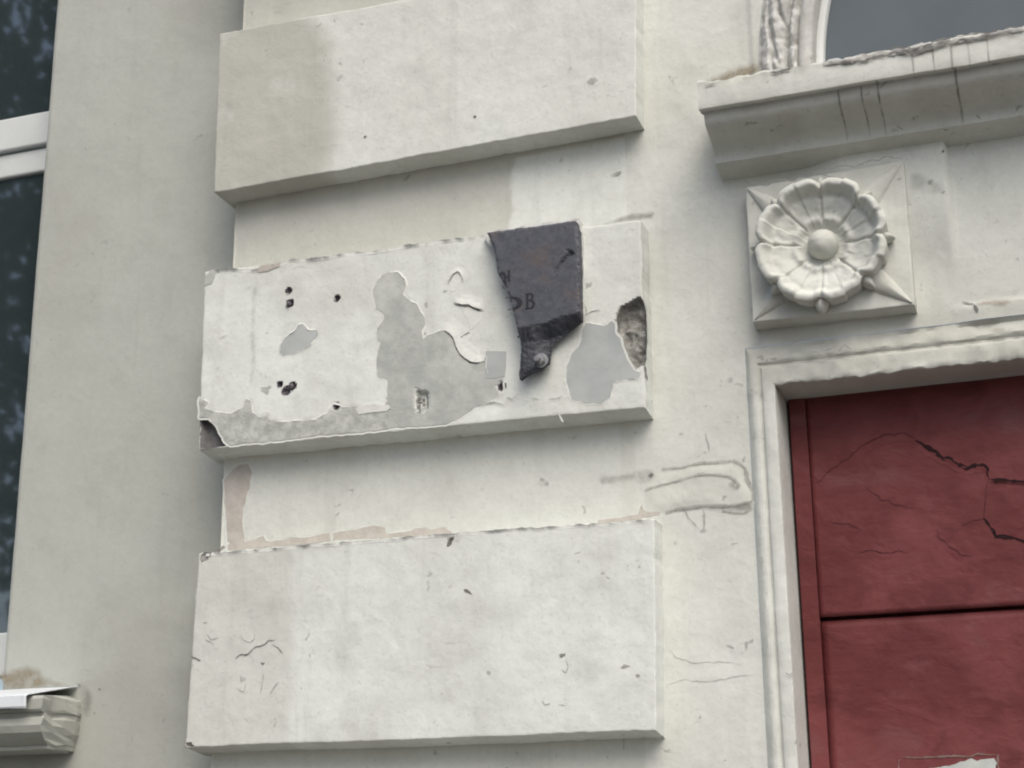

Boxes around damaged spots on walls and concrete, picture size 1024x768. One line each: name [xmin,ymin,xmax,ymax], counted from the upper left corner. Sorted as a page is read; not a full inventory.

peeling [204,235,485,286]
peeling [197,266,648,450]
peeling [200,462,662,561]
crack [815,433,1024,557]